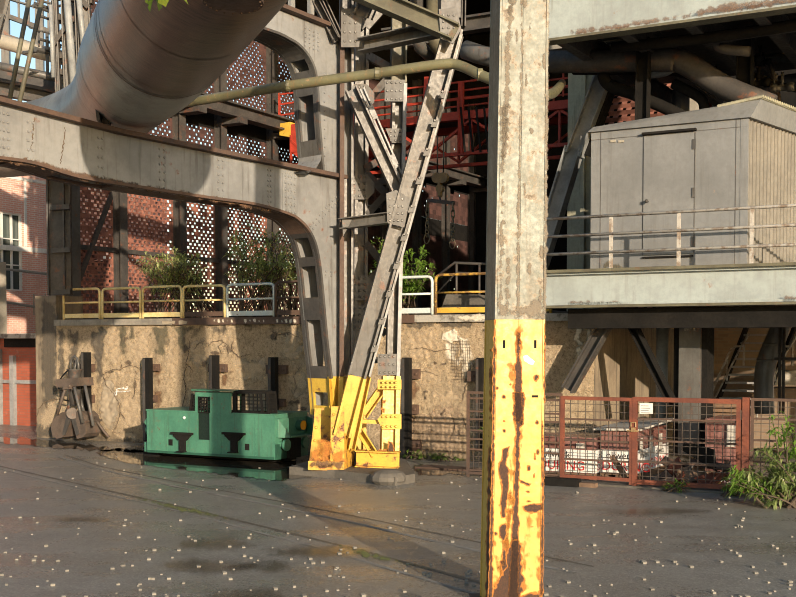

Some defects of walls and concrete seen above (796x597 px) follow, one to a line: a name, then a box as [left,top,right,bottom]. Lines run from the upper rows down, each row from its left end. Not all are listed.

rust [571,0,796,34]
peeling [498,0,549,319]
crack [103,364,142,434]
crack [182,340,246,407]
spalling [407,329,472,457]
rust [311,439,346,469]
rust [485,320,546,597]